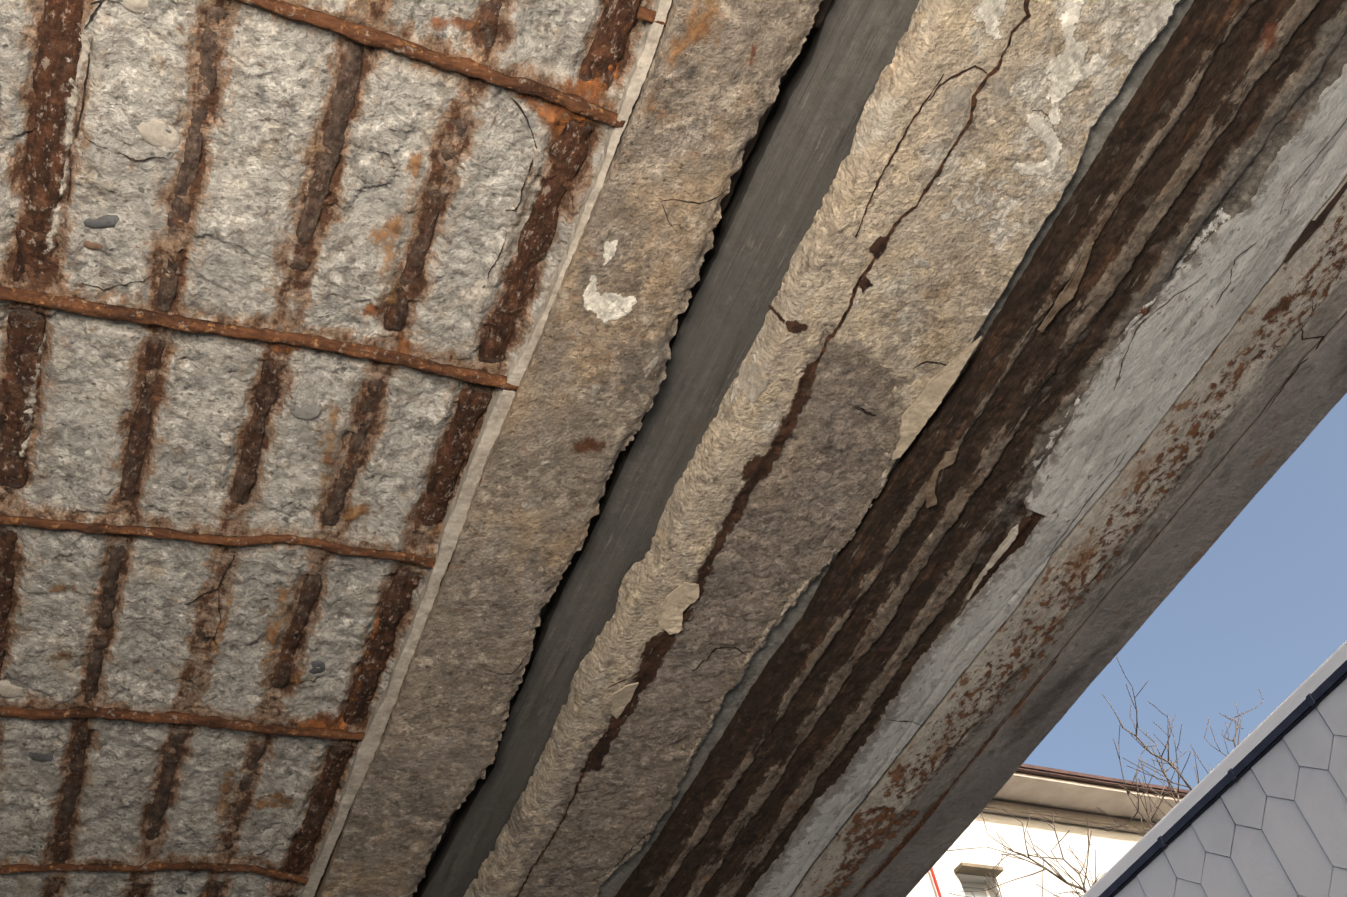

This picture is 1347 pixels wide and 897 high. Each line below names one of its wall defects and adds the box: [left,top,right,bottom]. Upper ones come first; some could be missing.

rust [432,17,477,30]
rust [518,62,618,142]
peeling [940,0,1178,227]
crack [683,0,1031,615]
peeling [1099,208,1231,360]
spalling [0,0,672,897]
rust [299,610,380,730]
crack [516,646,657,897]
rust [580,362,818,772]
spalling [515,330,982,897]
peeling [966,513,1044,600]
rust [819,202,1347,897]